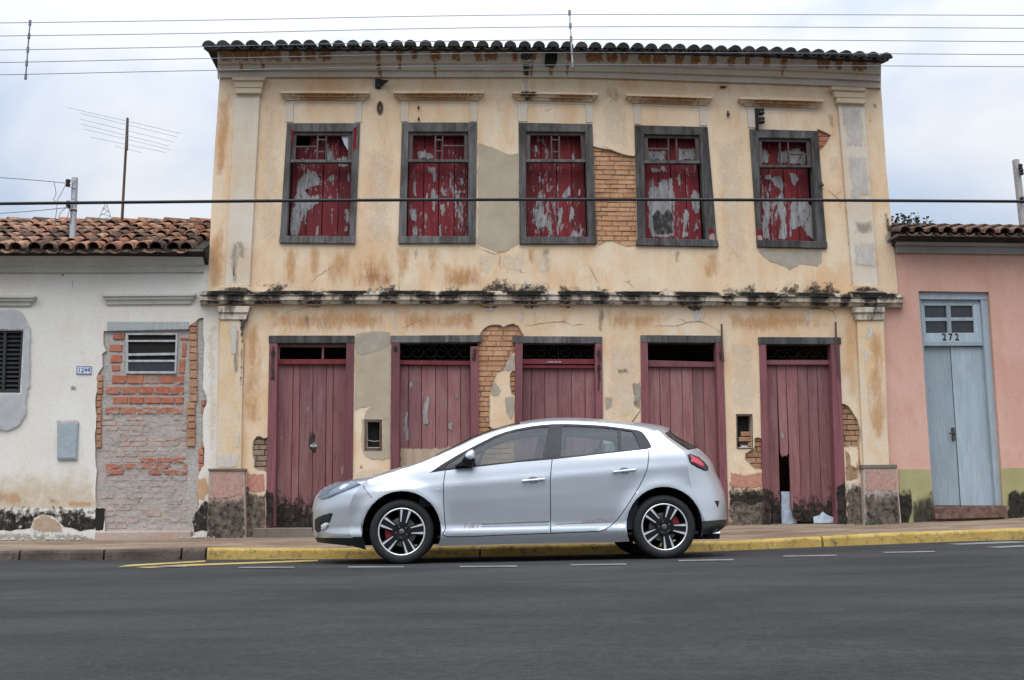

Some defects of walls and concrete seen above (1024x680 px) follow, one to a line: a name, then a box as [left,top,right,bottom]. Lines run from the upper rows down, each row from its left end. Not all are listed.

leakage [219,122,227,169]
spalling [593,146,715,247]
leakage [203,241,897,382]
spalling [477,323,524,465]
peeling [211,434,267,499]
spalling [729,432,762,488]
spalling [842,403,897,492]
leakage [0,487,96,531]
leakage [729,483,934,525]